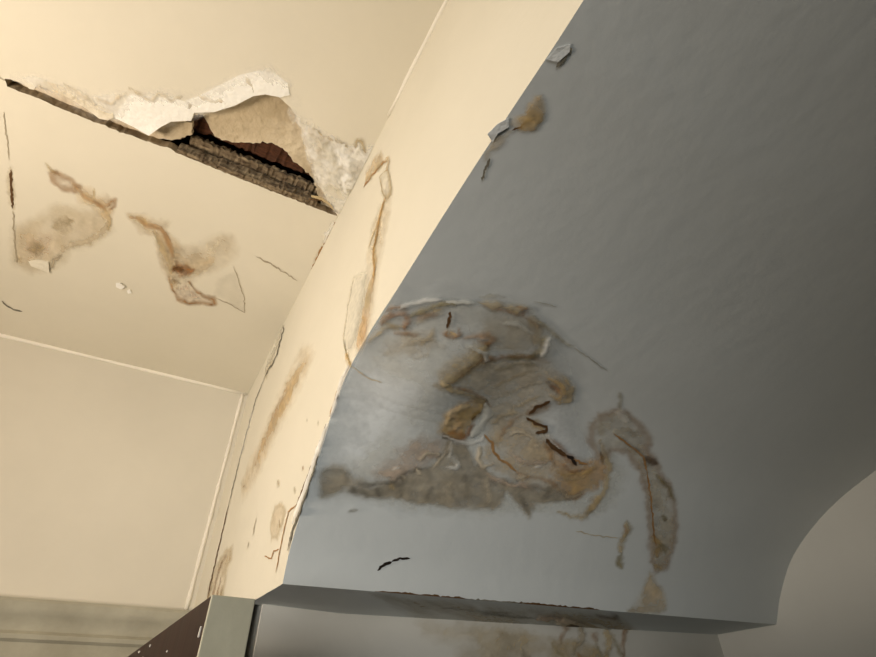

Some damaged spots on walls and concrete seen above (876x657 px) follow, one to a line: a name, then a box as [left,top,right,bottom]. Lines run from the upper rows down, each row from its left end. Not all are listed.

peeling [547,44,572,68]
flaking render [297,119,387,213]
peeling [488,98,544,142]
damp [24,187,114,273]
crack [207,327,284,598]
damp [258,363,304,460]
crack [265,342,380,569]